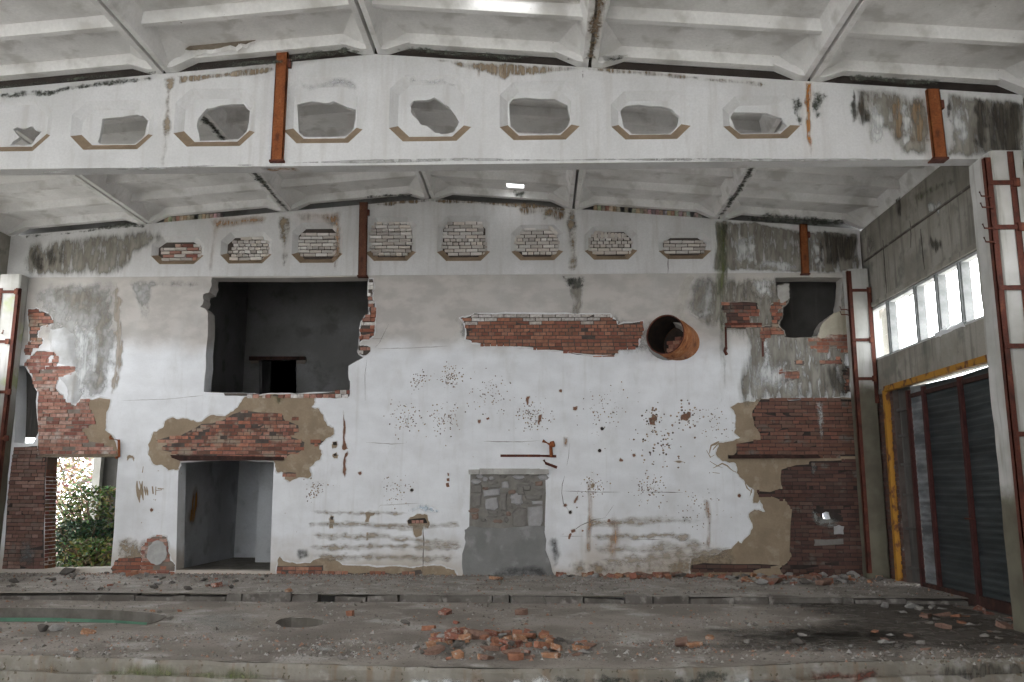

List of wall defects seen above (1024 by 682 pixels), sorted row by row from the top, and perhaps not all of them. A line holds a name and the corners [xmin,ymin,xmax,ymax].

water stain [794,93,826,122]
water stain [850,75,939,153]
water stain [947,95,1024,157]
water stain [26,223,158,396]
spalling [358,278,377,357]
peeling [459,312,645,357]
peeling [721,284,790,341]
water stain [691,169,872,426]
peeling [2,307,363,574]
spalling [572,381,628,453]
peeling [618,311,863,577]